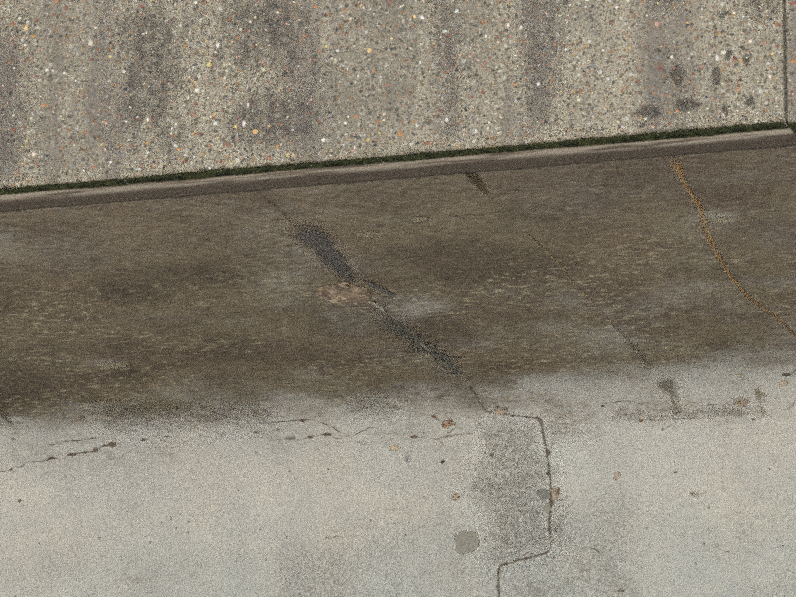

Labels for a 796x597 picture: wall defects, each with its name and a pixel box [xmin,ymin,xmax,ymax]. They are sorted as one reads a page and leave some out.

leakage [464,173,488,194]
crack [252,407,377,445]
crack [1,438,121,472]